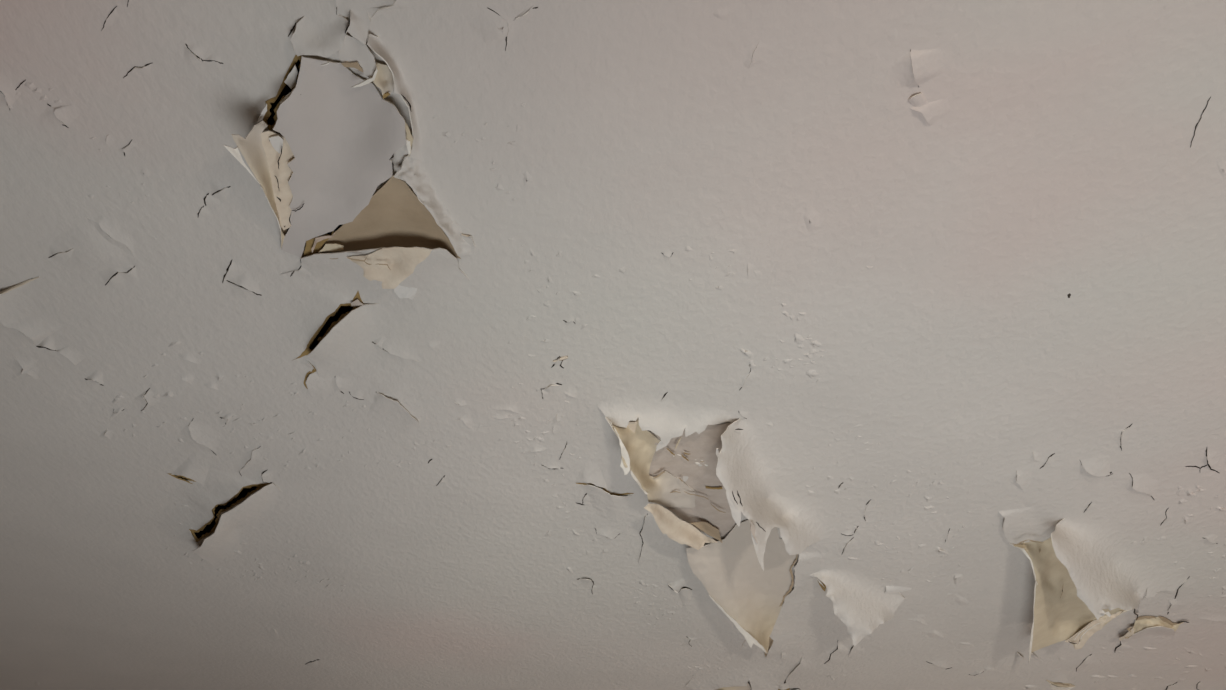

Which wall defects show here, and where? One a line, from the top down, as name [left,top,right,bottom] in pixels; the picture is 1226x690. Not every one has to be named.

peeling [224,0,475,399]
peeling [0,276,67,350]
peeling [167,450,283,565]
peeling [574,392,912,690]
peeling [998,506,1189,683]